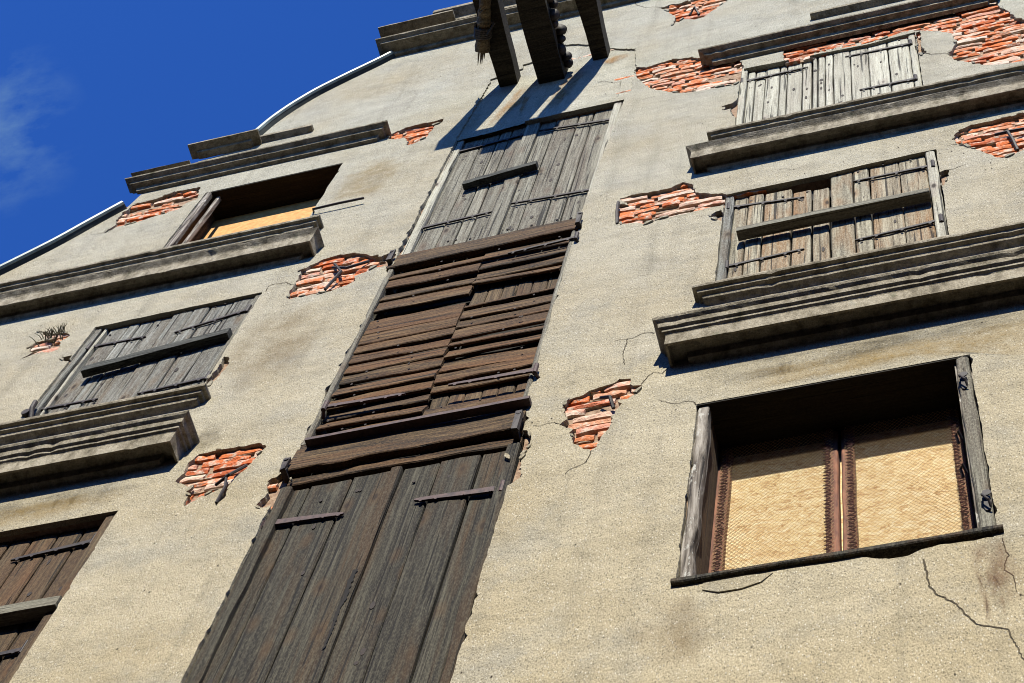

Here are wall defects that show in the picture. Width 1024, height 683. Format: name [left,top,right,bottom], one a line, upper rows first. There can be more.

flaking render [664,0,727,26]
flaking render [784,2,1024,68]
flaking render [457,45,743,141]
flaking render [387,122,441,145]
flaking render [952,112,1024,158]
flaking render [104,190,199,233]
flaking render [619,184,767,225]
flaking render [286,252,395,299]
flaking render [559,381,642,450]
flaking render [179,447,264,505]
crack [1002,538,1017,591]
crack [922,559,1024,660]